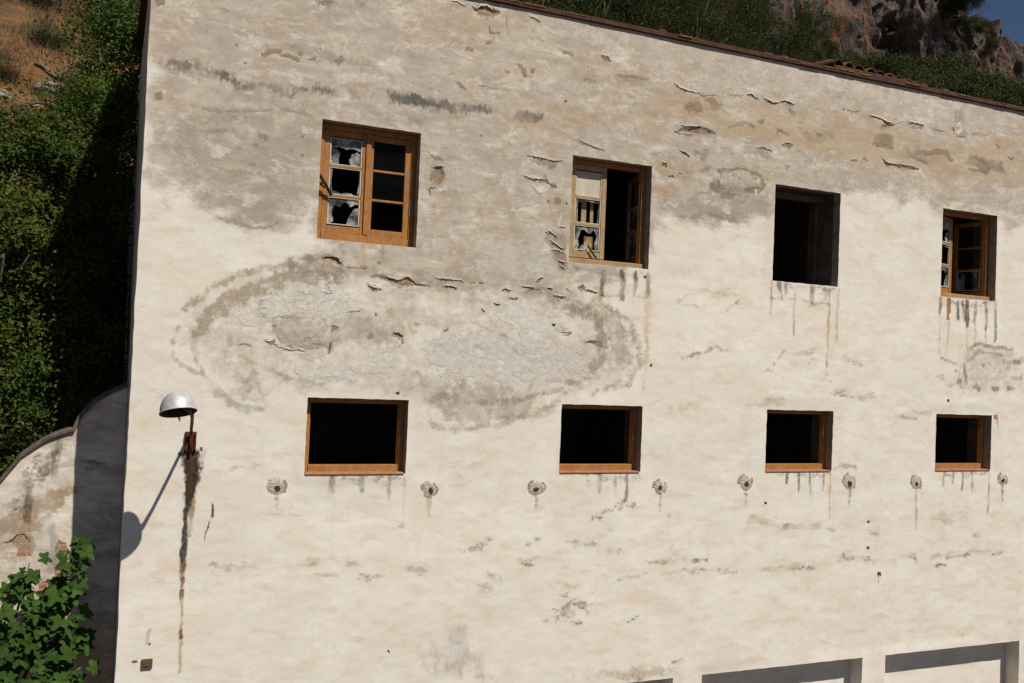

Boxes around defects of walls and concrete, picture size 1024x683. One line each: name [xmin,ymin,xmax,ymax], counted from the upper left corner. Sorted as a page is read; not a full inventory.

damp [388,91,466,112]
spalling [674,124,716,136]
spalling [875,133,953,170]
spalling [322,254,430,292]
peeling [475,225,567,311]
damp [939,297,970,332]
spalling [0,486,76,596]
corrosion [178,447,203,672]